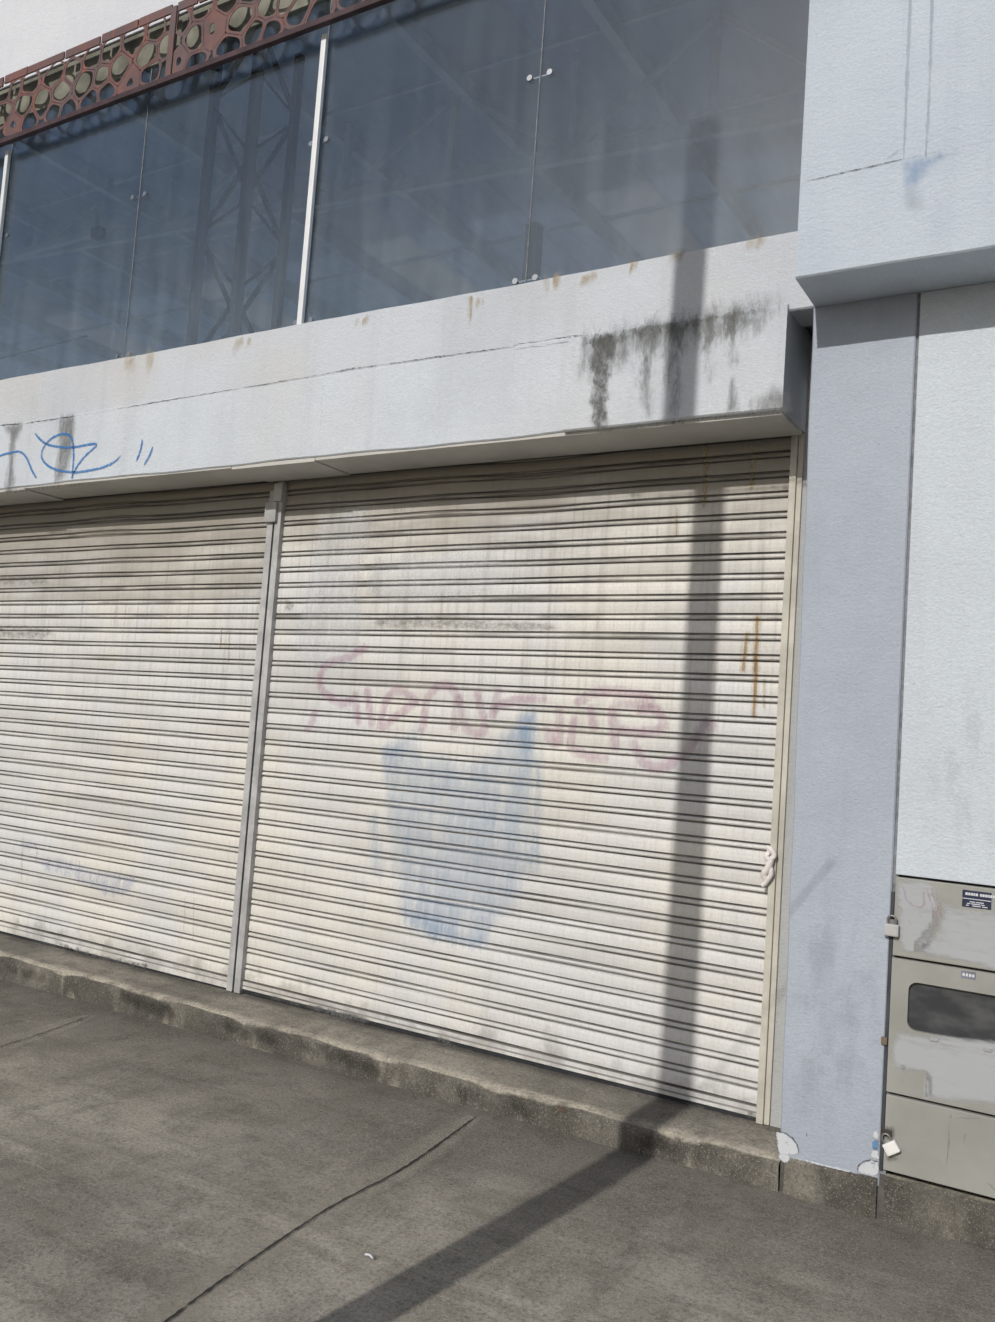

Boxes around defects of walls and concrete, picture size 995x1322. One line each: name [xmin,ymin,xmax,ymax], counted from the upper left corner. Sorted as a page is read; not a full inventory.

water stain [590,308,746,430]
corrosion [743,617,759,711]
peeling [776,1131,879,1176]